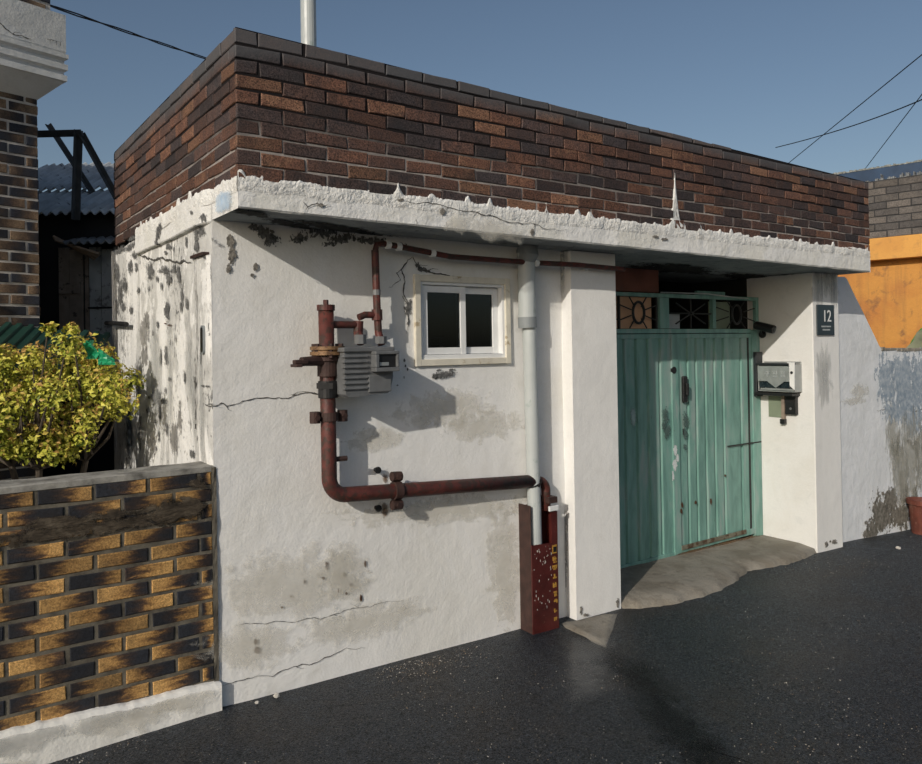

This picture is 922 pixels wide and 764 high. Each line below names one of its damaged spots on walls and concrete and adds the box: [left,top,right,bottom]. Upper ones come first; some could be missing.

crack [134,252,195,269]
peeling [248,223,386,247]
crack [393,257,450,334]
crack [194,291,317,430]
peeling [874,347,922,449]
peeling [661,407,689,481]
spalling [0,476,207,548]
crack [241,601,396,625]
crack [223,648,359,686]